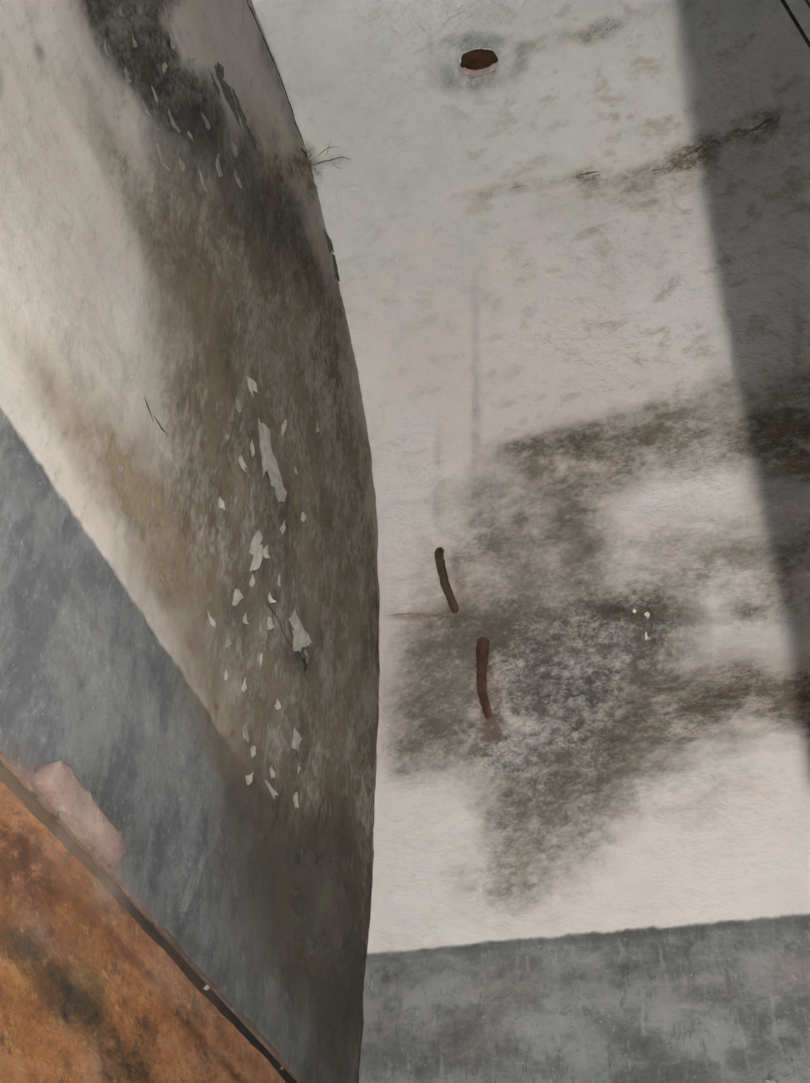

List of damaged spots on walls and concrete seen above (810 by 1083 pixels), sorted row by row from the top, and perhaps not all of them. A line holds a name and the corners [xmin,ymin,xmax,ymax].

peeling [247,376,258,397]
water stain [86,0,380,1025]
peeling [238,418,287,502]
water stain [513,407,706,581]
water stain [722,393,810,481]
peeling [232,531,270,624]
peeling [288,609,312,670]
peeling [243,723,256,758]
peeling [246,766,278,799]
peeling [291,727,302,775]
water stain [400,585,810,875]